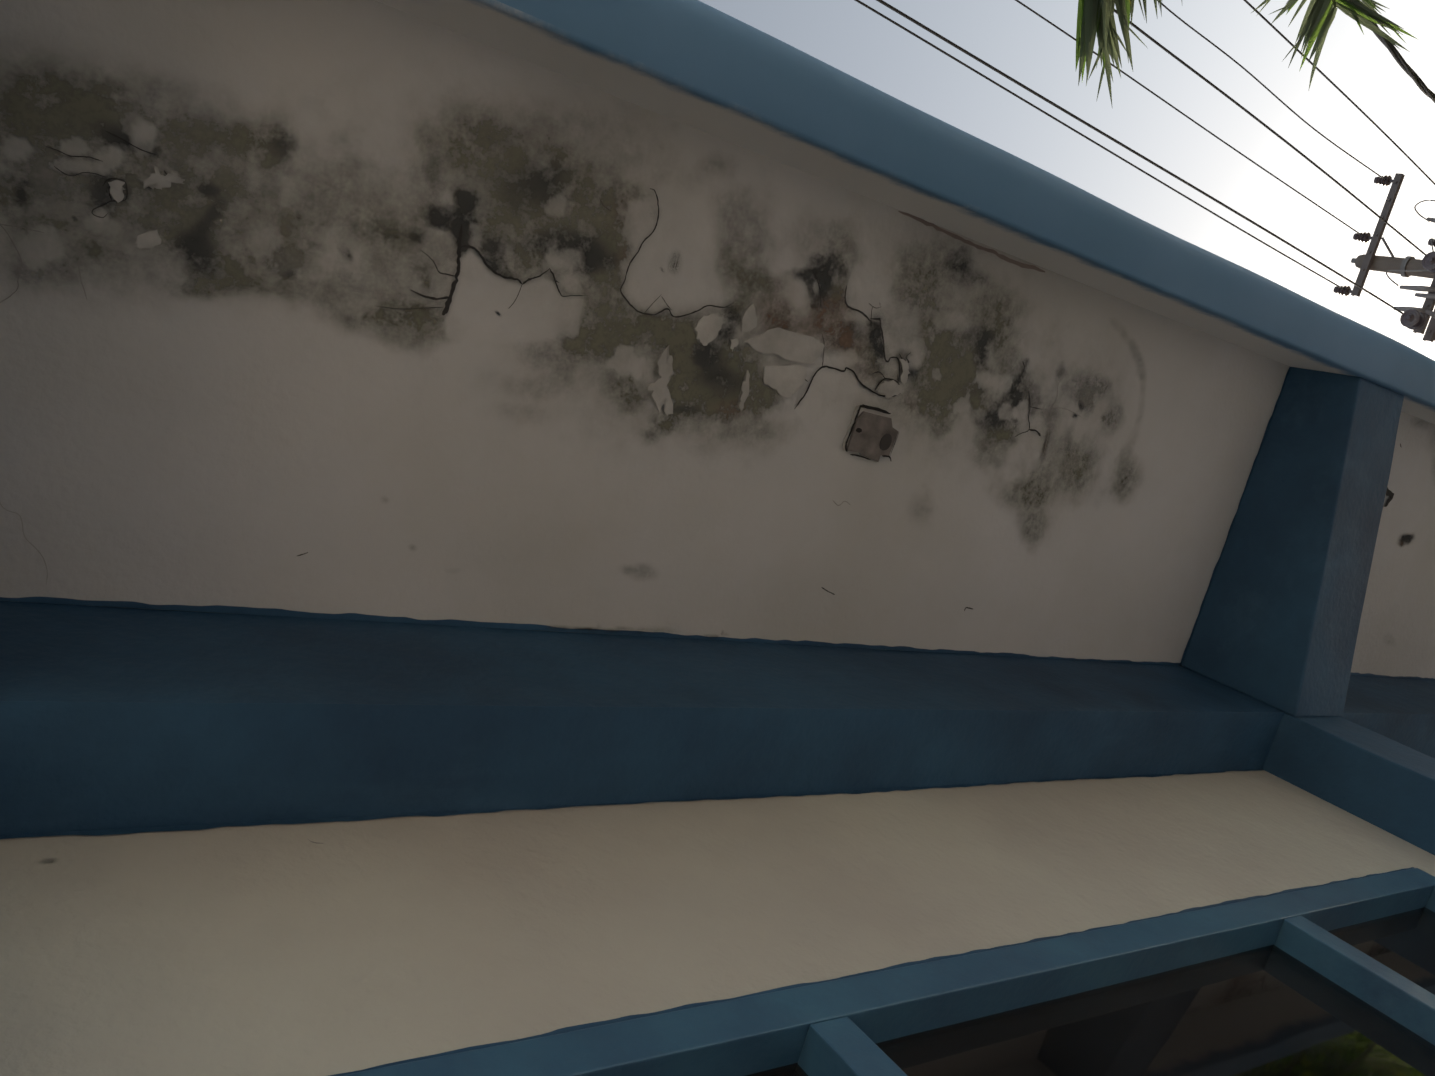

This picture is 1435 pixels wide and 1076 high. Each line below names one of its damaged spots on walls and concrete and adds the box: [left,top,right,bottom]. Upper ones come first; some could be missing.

flaking render [108,166,185,203]
water stain [0,68,324,296]
flaking render [135,230,161,251]
crack [378,188,734,318]
water stain [345,114,884,438]
crack [899,211,1045,273]
flaking render [647,345,674,416]
flaking render [694,304,824,411]
crack [795,270,911,408]
flaking render [877,359,910,398]
water stain [899,247,1033,451]